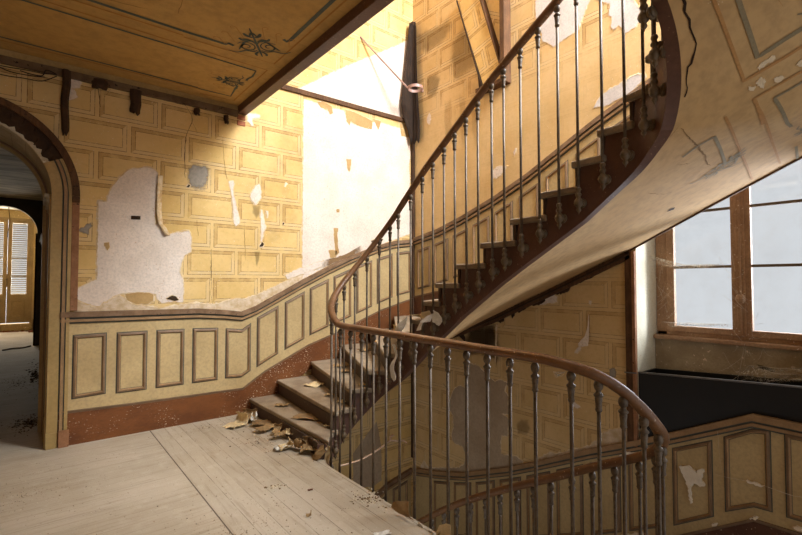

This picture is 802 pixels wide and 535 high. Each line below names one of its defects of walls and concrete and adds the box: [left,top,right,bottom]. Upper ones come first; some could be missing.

peeling [534,0,640,48]
crack [682,0,697,97]
peeling [593,72,647,109]
flaking render [748,55,785,91]
peeling [74,40,411,312]
peeling [679,465,706,504]